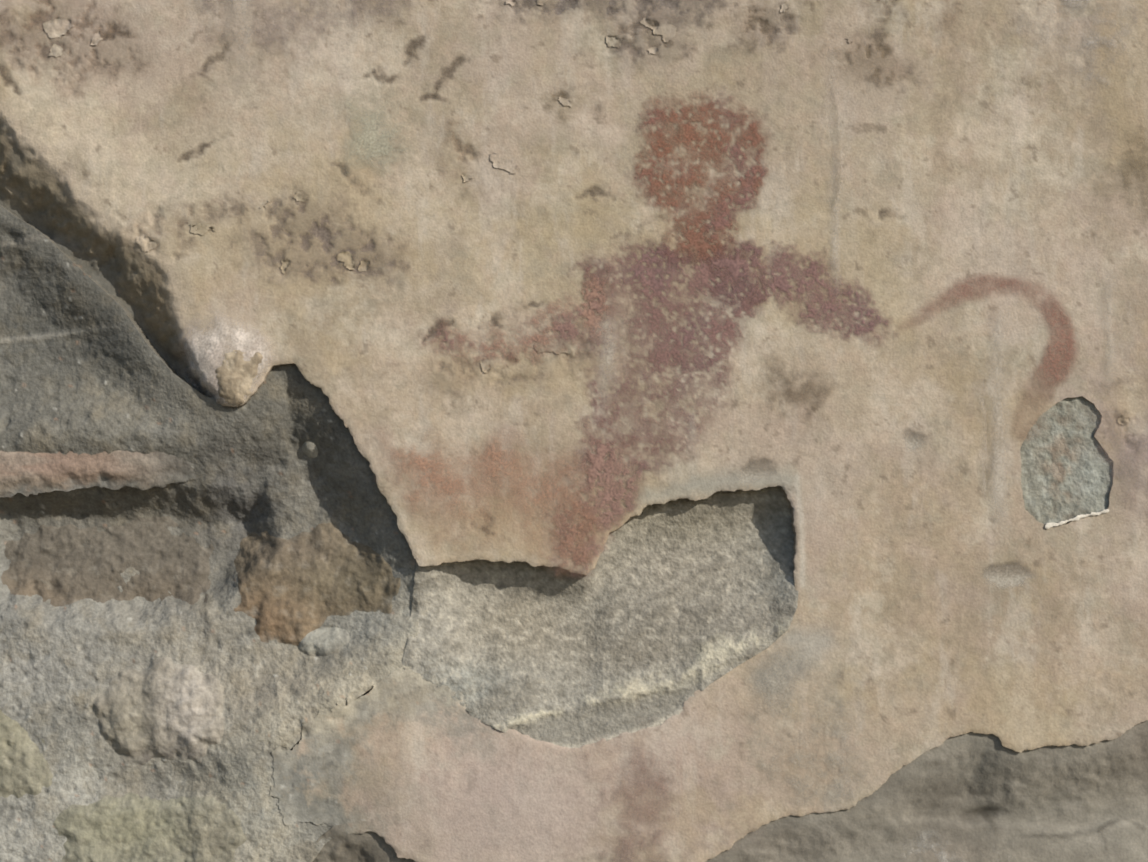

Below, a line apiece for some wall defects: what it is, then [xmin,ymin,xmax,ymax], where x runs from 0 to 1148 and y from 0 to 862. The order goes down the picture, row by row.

peeling [2,0,121,69]
peeling [257,190,396,282]
spalling [1020,397,1113,530]
spalling [0,205,799,862]
spalling [706,720,1148,862]